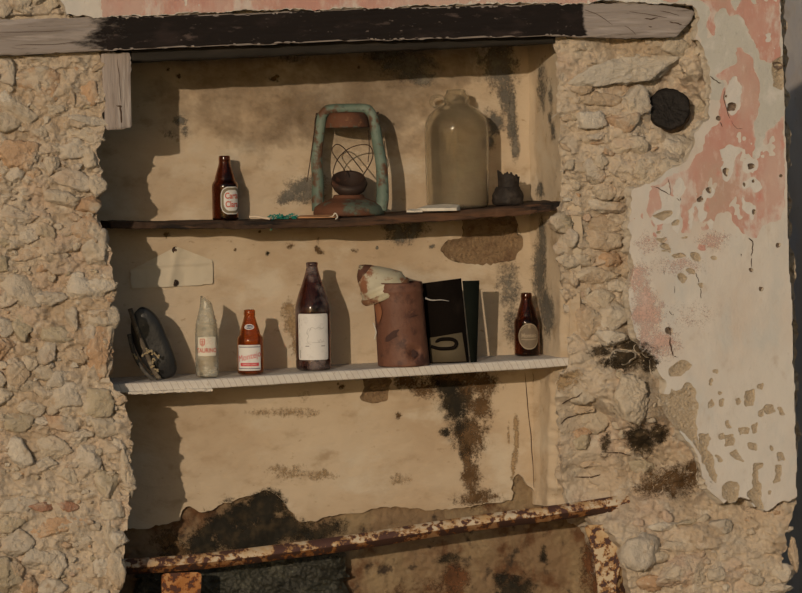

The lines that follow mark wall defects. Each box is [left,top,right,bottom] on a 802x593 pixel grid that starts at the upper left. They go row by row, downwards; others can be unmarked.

damp [537,68,555,139]
peeling [617,0,785,220]
flaking render [440,216,523,265]
peeling [652,177,715,283]
damp [272,464,333,480]
damp [394,371,498,509]
flaking render [659,360,785,511]
corrosion [580,542,598,593]